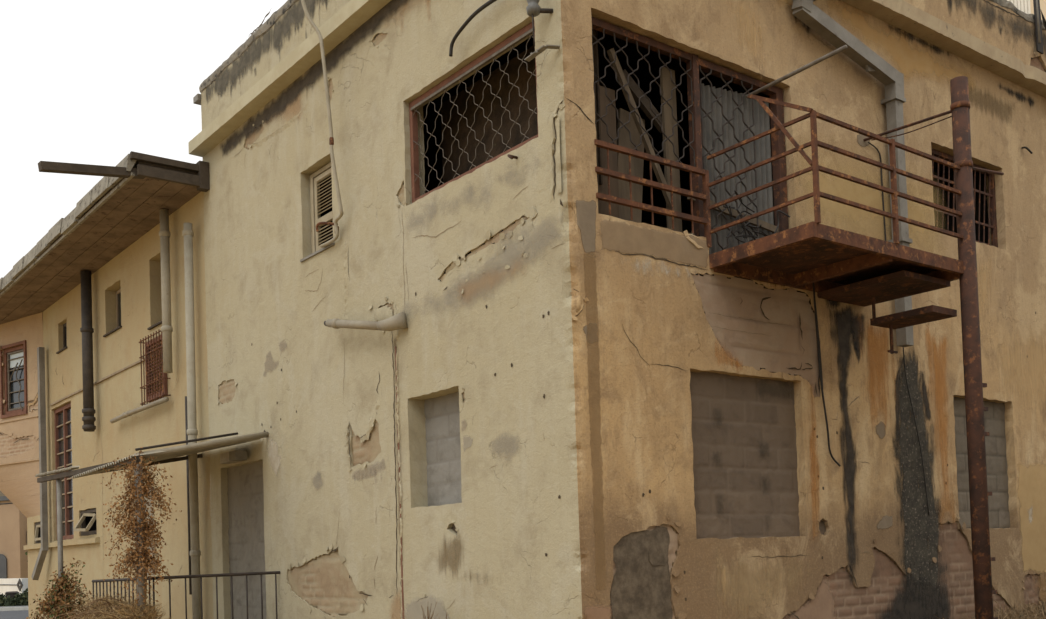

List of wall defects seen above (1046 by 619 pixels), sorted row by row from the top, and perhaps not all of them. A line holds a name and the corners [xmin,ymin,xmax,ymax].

mould [206,0,408,154]
water stain [841,8,969,80]
water stain [948,0,1046,53]
crack [622,324,686,371]
crack [714,297,820,395]
flaking render [0,432,35,457]
flaking render [347,422,381,471]
water stain [827,299,864,582]
water stain [881,351,950,619]
flaking render [609,514,687,619]
flaking render [782,539,911,619]
flaking render [932,515,975,619]